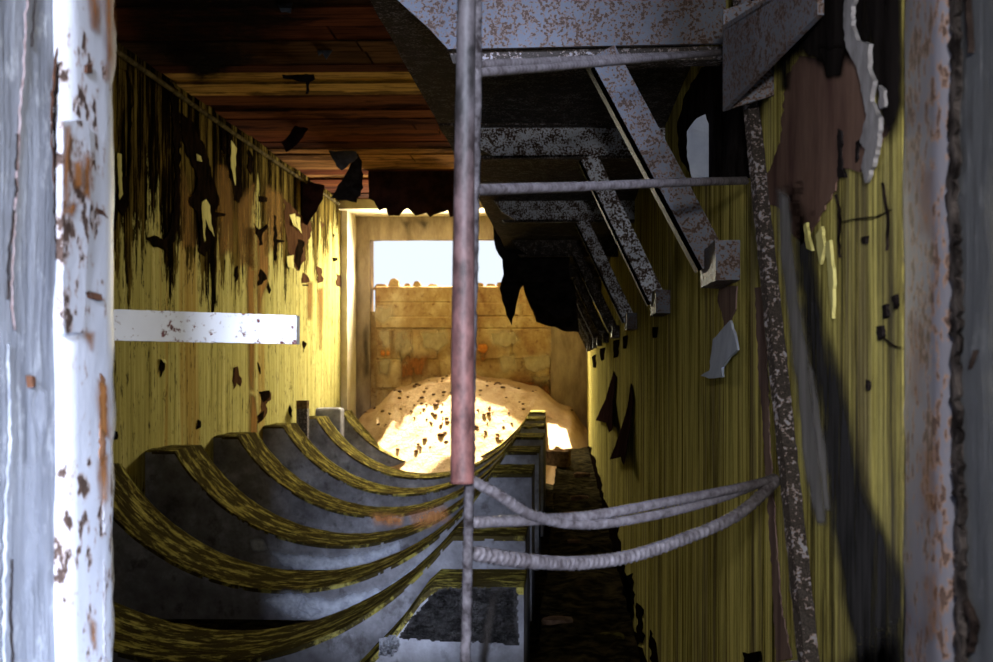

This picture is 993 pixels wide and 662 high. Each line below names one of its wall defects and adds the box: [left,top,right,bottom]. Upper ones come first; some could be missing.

corrosion [89,0,112,73]
peeling [282,74,315,94]
corrosion [63,126,91,215]
peeling [113,68,134,231]
peeling [146,82,226,257]
peeling [219,126,253,203]
peeling [281,125,308,152]
peeling [767,0,888,319]
peeling [257,269,271,294]
spalling [876,294,900,340]
corrosion [99,382,109,437]
corrosion [99,457,107,502]